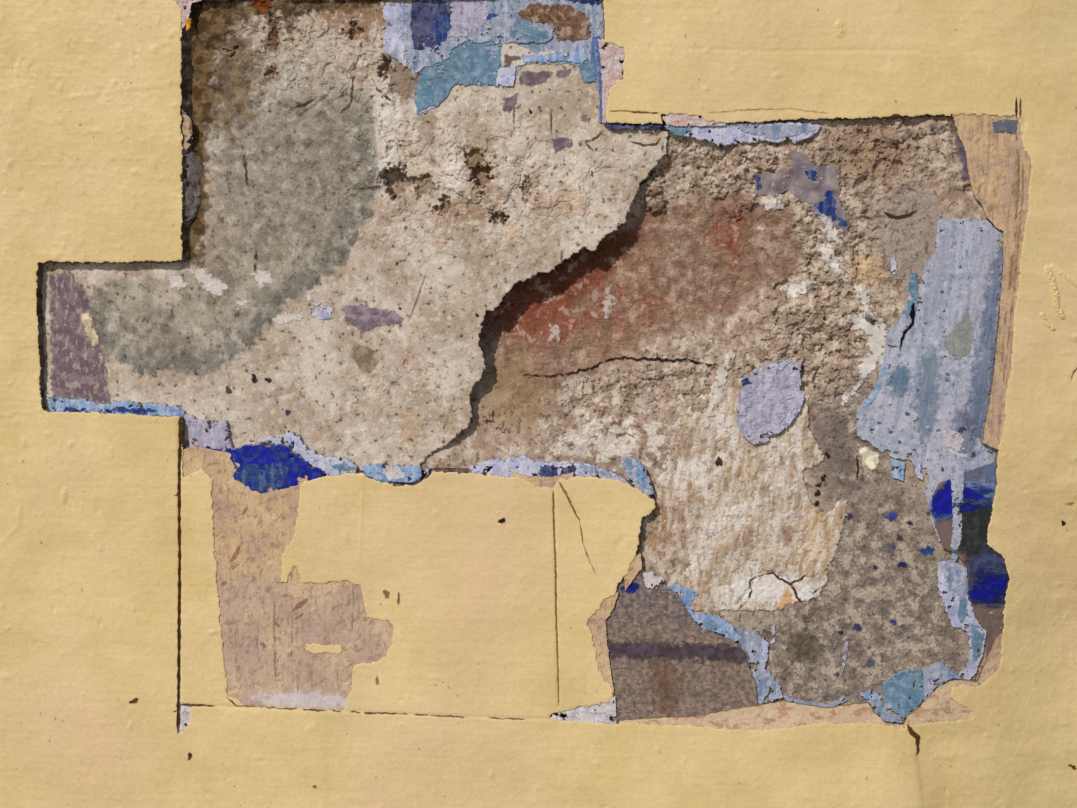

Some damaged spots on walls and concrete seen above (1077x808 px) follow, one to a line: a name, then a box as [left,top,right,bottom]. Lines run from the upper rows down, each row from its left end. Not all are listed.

peeling [992,119,1018,134]
peeling [81,312,99,346]
peeling [309,305,333,320]
crack [523,356,716,377]
crack [552,482,595,705]
crack [740,572,817,607]
peeling [587,569,742,690]
peeling [968,592,1006,656]
spalling [970,644,987,681]
peeling [977,632,1003,685]
crack [907,724,920,755]